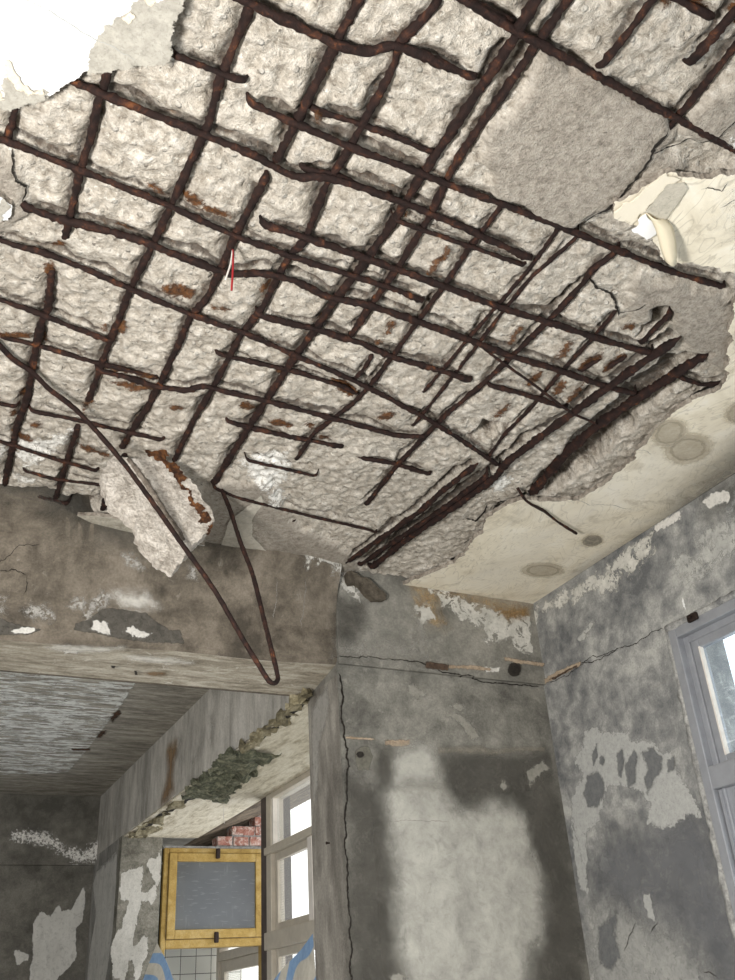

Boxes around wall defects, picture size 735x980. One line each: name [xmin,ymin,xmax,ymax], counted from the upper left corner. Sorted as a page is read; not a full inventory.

corrosion [182,189,232,218]
corrosion [161,281,195,299]
corrosion [426,245,451,275]
spalling [0,0,735,686]
corrosion [11,420,41,442]
water stain [652,420,709,464]
water stain [582,535,602,546]
crack [336,628,662,980]
peeling [570,726,702,895]
water stain [348,743,582,980]
peeling [14,849,162,980]
peeling [585,894,723,980]